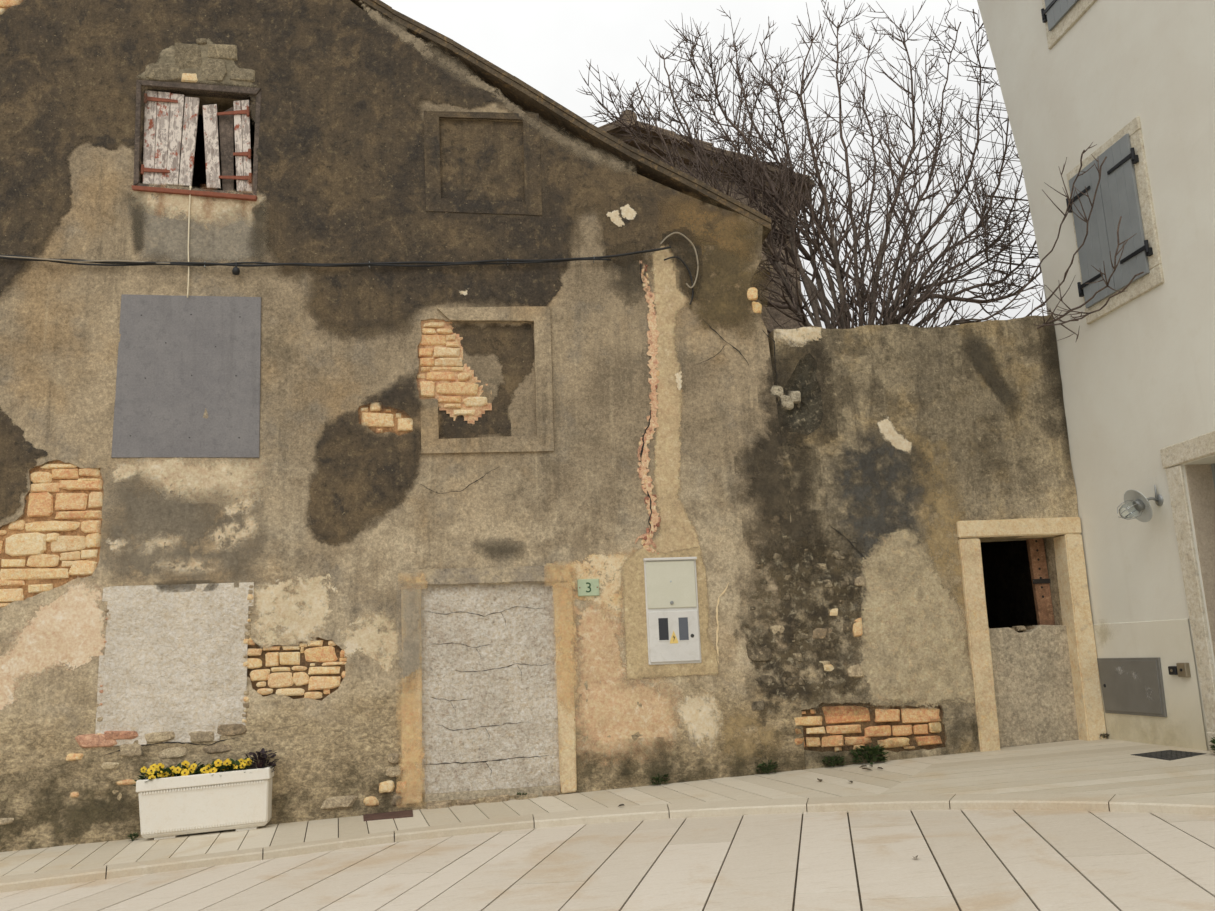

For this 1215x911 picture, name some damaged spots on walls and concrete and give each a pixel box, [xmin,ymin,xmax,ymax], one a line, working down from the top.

damp [129,187,265,262]
peeling [0,0,741,546]
damp [612,252,644,297]
damp [662,222,762,329]
peeling [878,417,912,453]
flaking render [0,407,111,710]
flaking render [66,573,399,785]
damp [620,748,711,785]
damp [724,426,964,777]
peeling [794,529,975,752]